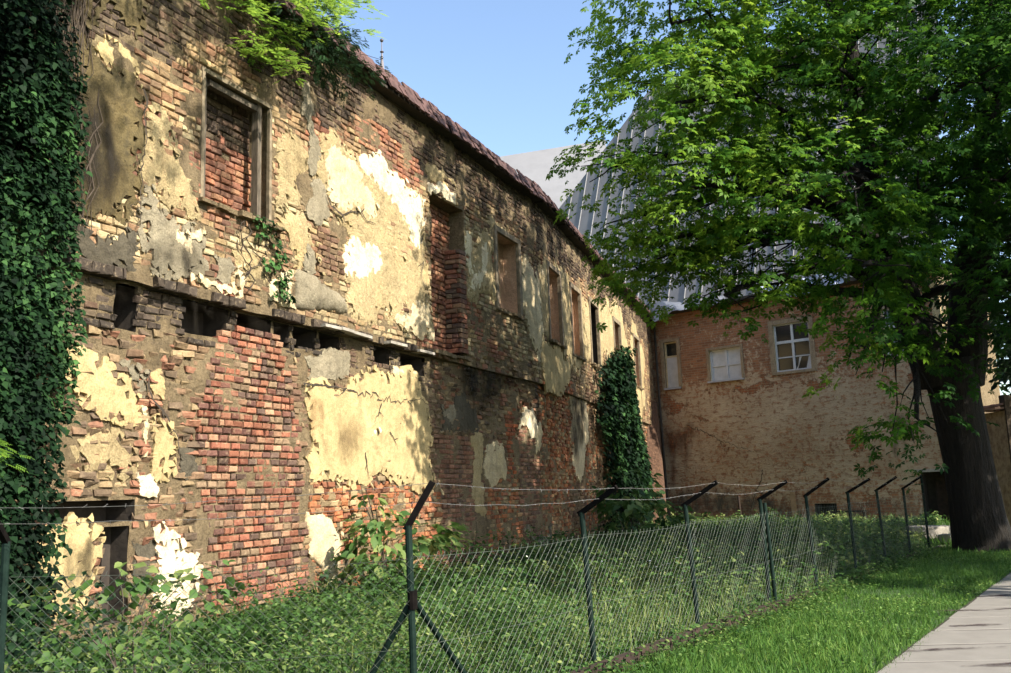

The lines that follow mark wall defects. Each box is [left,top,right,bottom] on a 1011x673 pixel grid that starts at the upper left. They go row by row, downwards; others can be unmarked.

leakage [85,104,120,198]
flaking render [35,0,457,342]
flaking render [58,341,199,498]